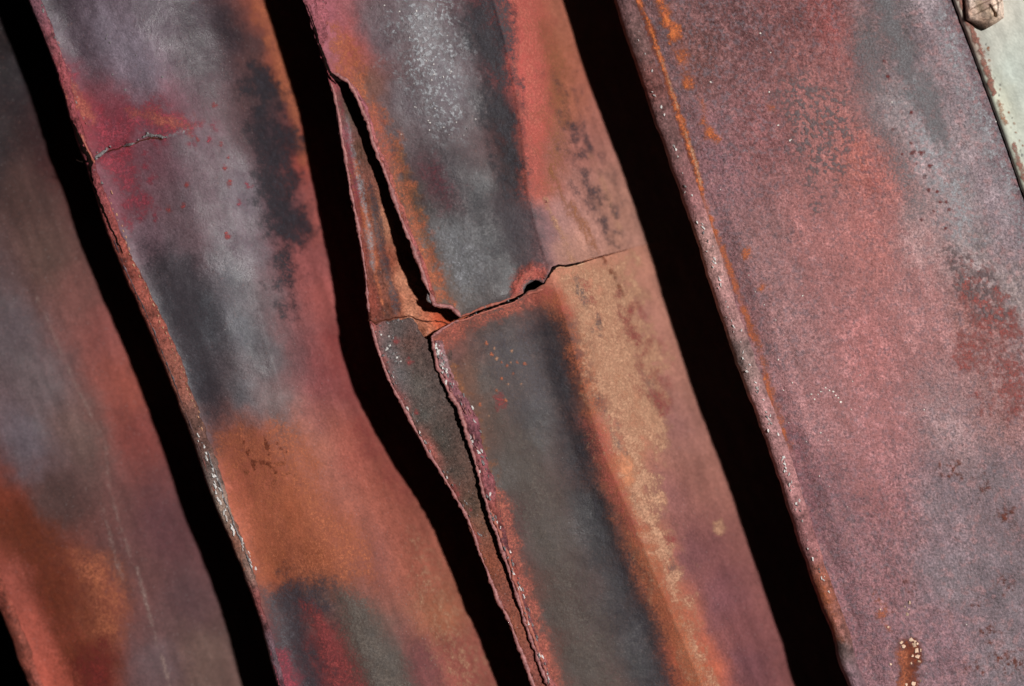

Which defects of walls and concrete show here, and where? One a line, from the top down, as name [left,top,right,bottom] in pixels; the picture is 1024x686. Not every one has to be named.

crack [71,121,184,254]
corrosion [59,68,232,229]
corrosion [253,0,317,171]
corrosion [329,25,535,686]
crack [368,293,523,337]
corrosion [500,0,563,204]
crack [548,250,626,288]
corrosion [636,0,739,294]
corrosion [770,23,865,214]
corrosion [957,0,1007,124]
corrosion [943,246,1024,421]
corrosion [433,253,719,686]